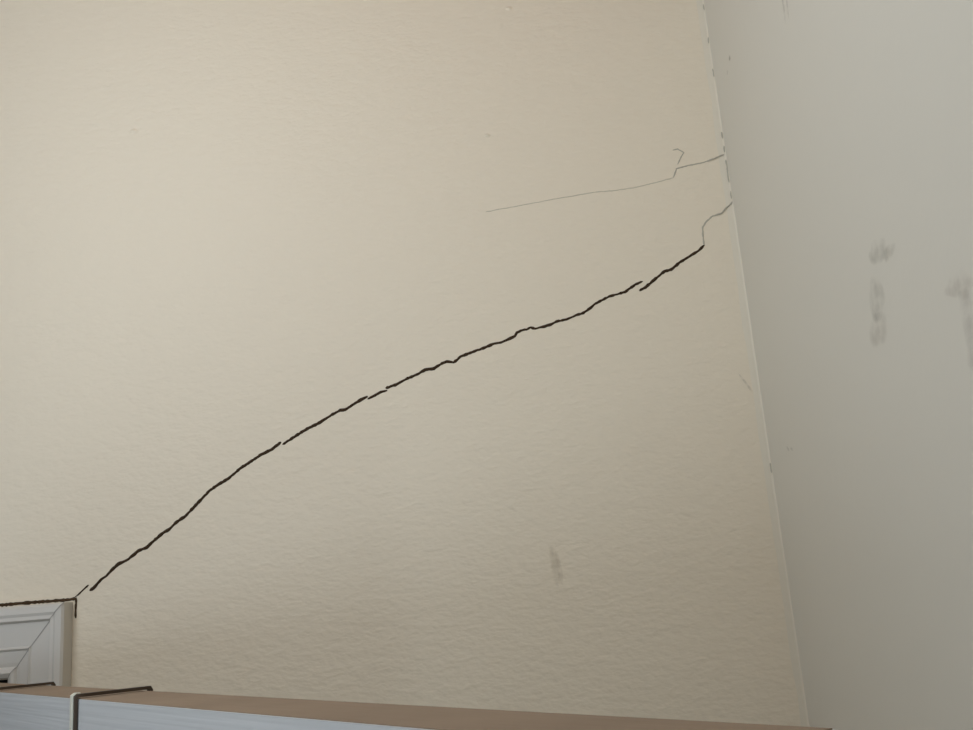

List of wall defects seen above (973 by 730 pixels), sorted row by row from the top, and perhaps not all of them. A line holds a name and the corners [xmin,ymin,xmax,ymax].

crack [75,132,732,597]